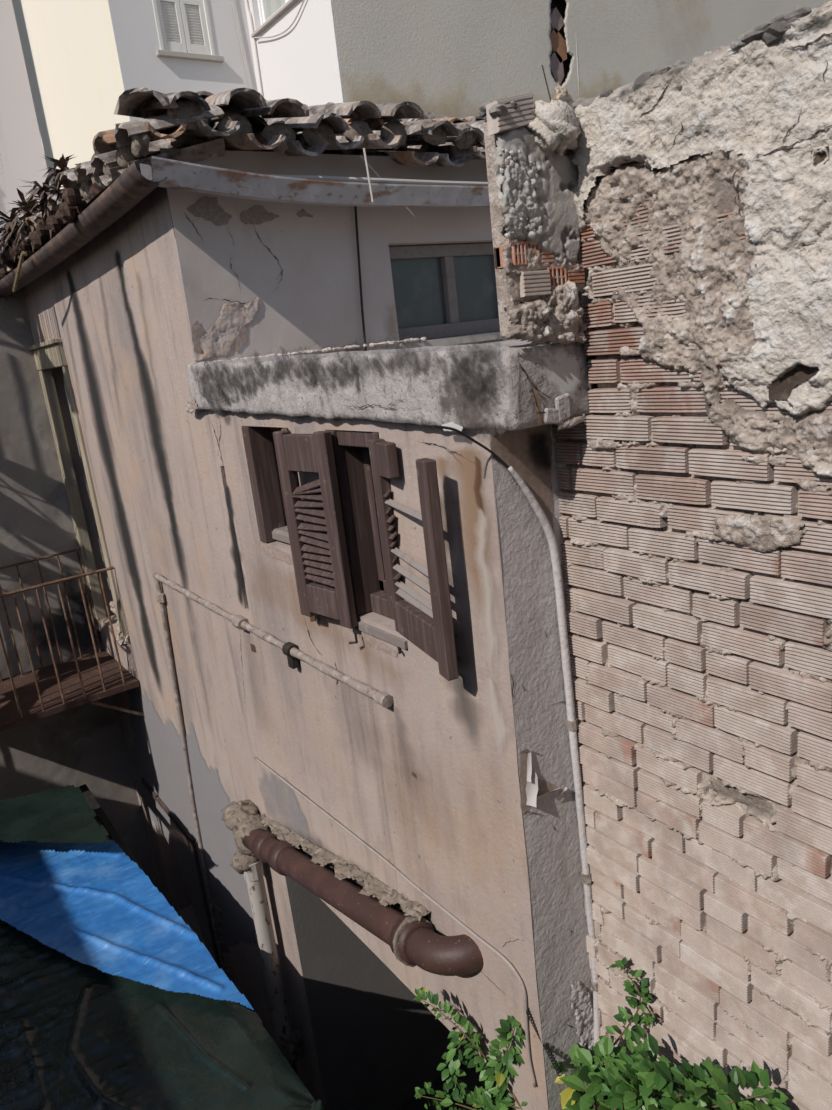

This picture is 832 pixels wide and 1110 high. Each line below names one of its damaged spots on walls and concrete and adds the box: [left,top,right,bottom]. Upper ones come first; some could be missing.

spalling [479,101,537,121]
peeling [188,196,279,226]
spalling [501,165,542,239]
crack [200,218,283,309]
flaking render [192,297,260,362]
flaking render [582,145,832,495]
damp [116,252,185,588]
damp [196,336,503,433]
damp [67,271,159,685]
flaking render [491,414,585,532]
spalling [713,513,806,552]
peeling [520,749,568,815]